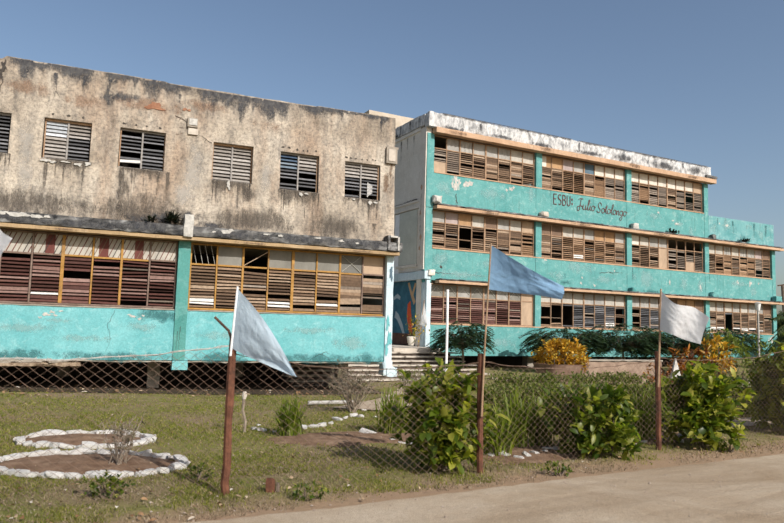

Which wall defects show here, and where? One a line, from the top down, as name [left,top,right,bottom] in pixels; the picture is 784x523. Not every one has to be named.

leakage [11,57,94,87]
leakage [104,73,290,120]
leakage [301,105,389,131]
leakage [443,113,706,174]
leakage [44,157,87,181]
peeling [438,176,474,190]
leakage [0,167,387,248]